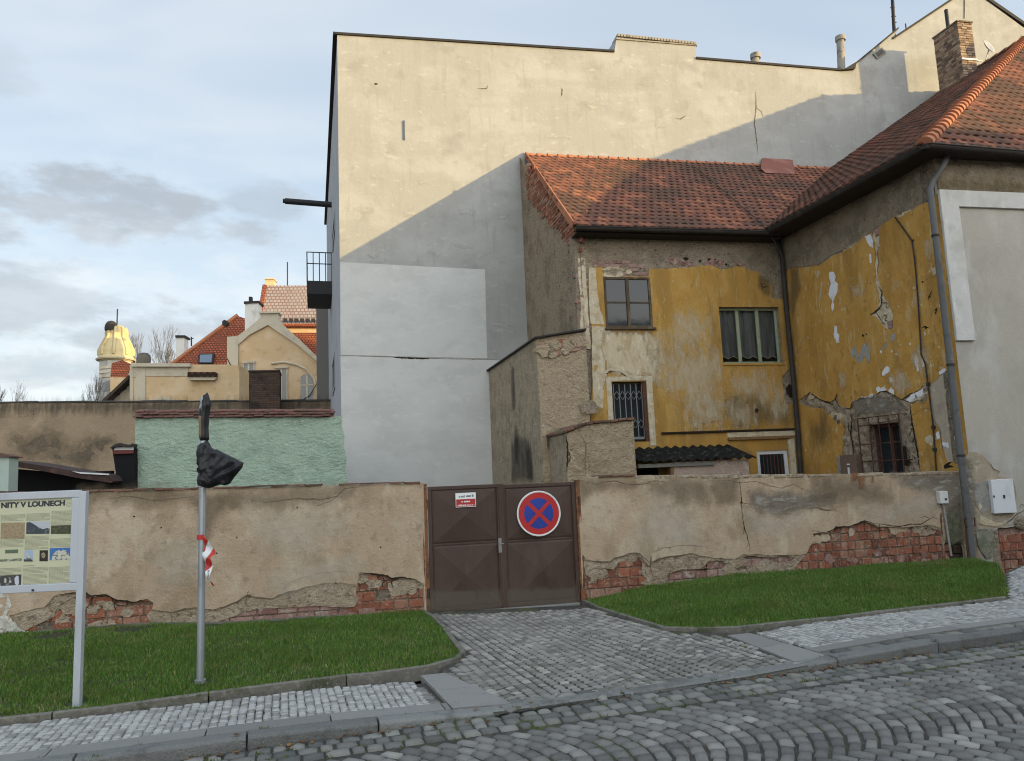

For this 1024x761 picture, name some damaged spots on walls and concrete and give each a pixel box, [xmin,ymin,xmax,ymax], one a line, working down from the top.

crack [754,92,763,152]
flaking render [525,163,946,425]
flaking render [798,366,949,473]
crack [717,480,937,550]
flaking render [966,451,1024,580]
flaking render [0,573,430,634]
flaking render [578,521,965,605]